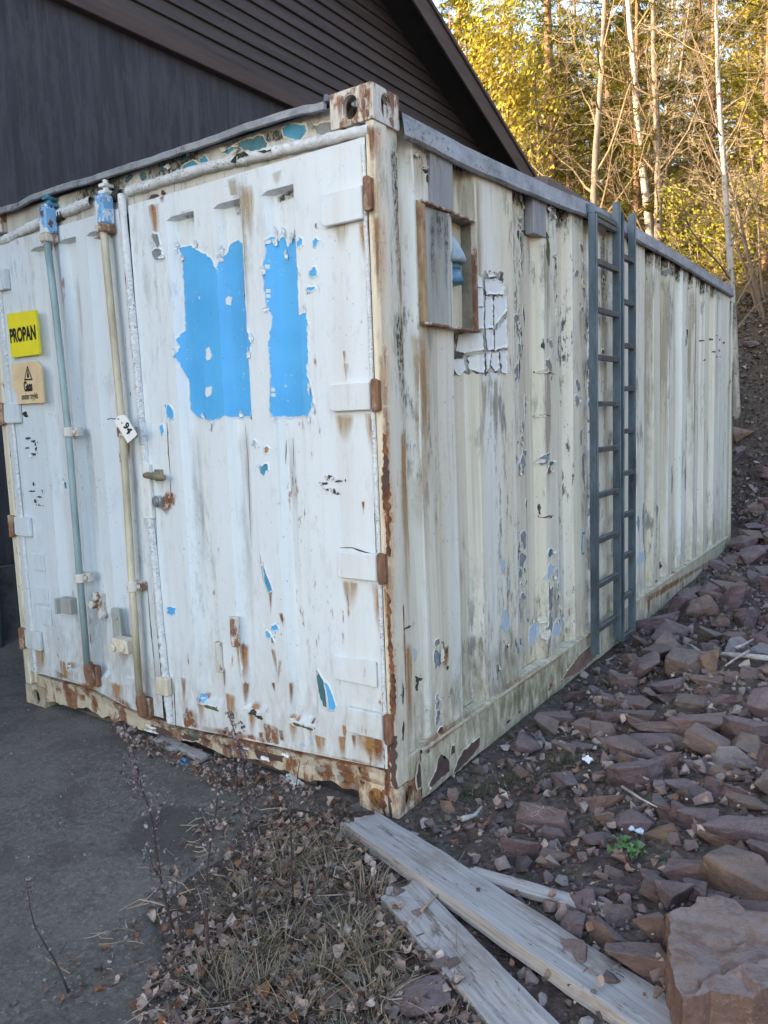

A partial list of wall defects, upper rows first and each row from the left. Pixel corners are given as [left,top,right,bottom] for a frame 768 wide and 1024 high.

peeling [220,133,268,157]
peeling [281,120,333,141]
corrosion [360,182,382,276]
peeling [150,231,254,436]
peeling [261,221,321,422]
peeling [516,395,557,477]
corrosion [218,349,412,818]
peeling [496,530,565,680]
corrosion [56,662,96,705]
corrosion [184,693,210,730]
peeling [316,667,337,712]
peeling [415,688,481,791]